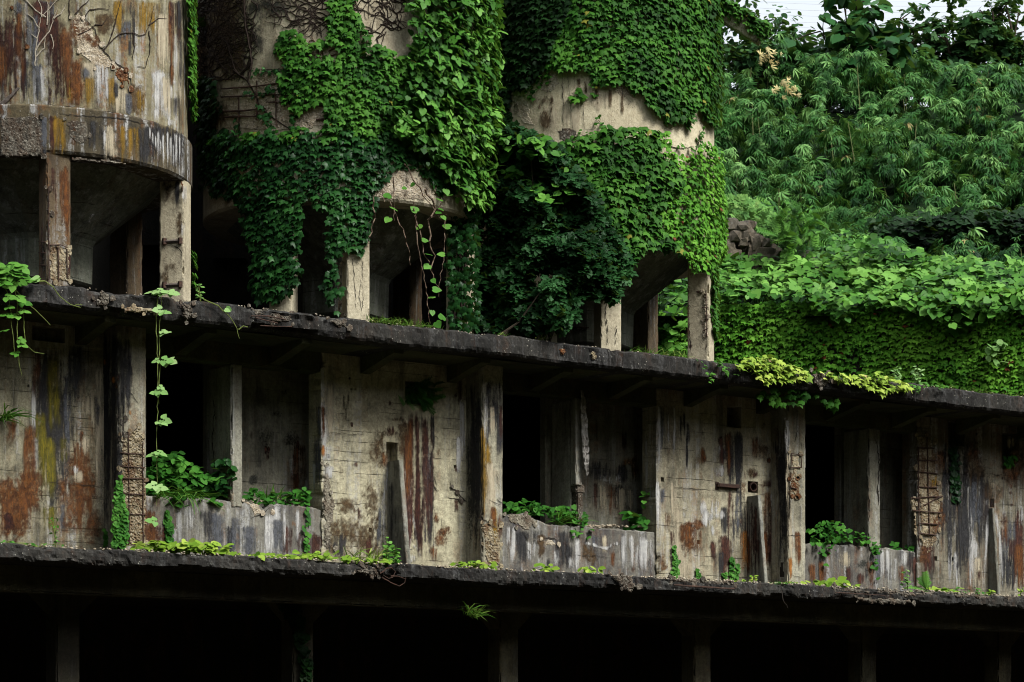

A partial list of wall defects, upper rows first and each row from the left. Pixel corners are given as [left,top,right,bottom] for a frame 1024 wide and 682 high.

rust [0,1,99,105]
peeling [68,10,134,92]
spalling [38,185,73,286]
spalling [92,290,159,316]
rust [0,419,43,542]
water stain [29,334,132,531]
rust [60,431,103,543]
spalling [115,413,149,550]
rust [370,414,451,560]
water stain [457,378,542,562]
rust [665,469,771,574]
spalling [910,432,944,553]